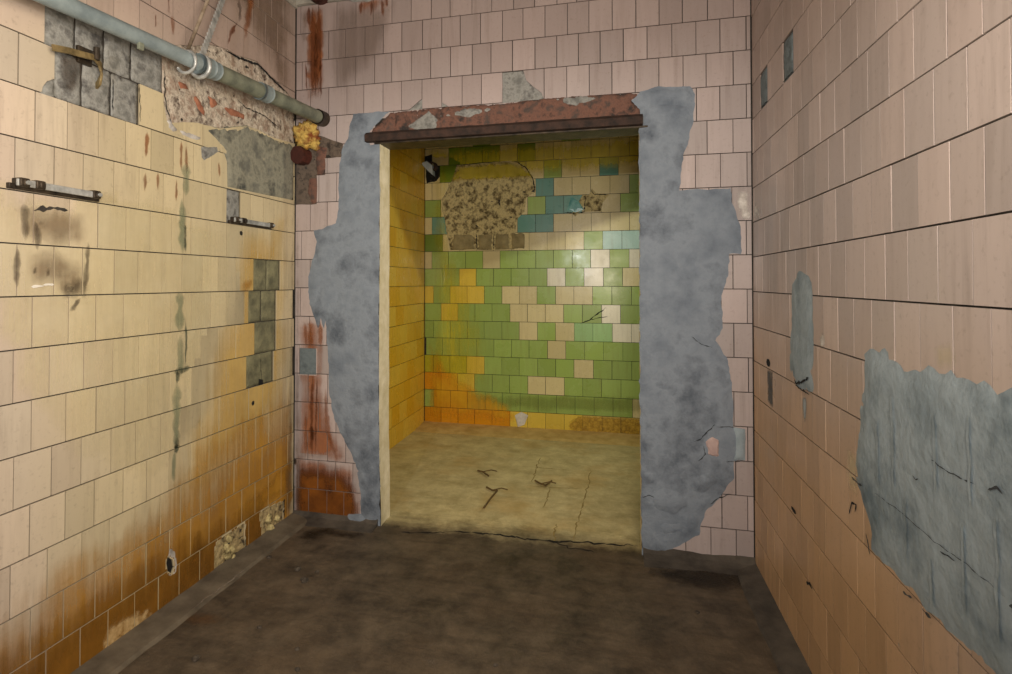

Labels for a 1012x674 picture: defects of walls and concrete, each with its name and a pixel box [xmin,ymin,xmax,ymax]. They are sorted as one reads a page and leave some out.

peeling [39,6,294,160]
rust [305,9,322,91]
peeling [296,136,343,205]
spalling [422,154,444,184]
spalling [442,161,535,250]
peeling [245,259,279,388]
rust [305,325,322,348]
rust [1,375,354,674]